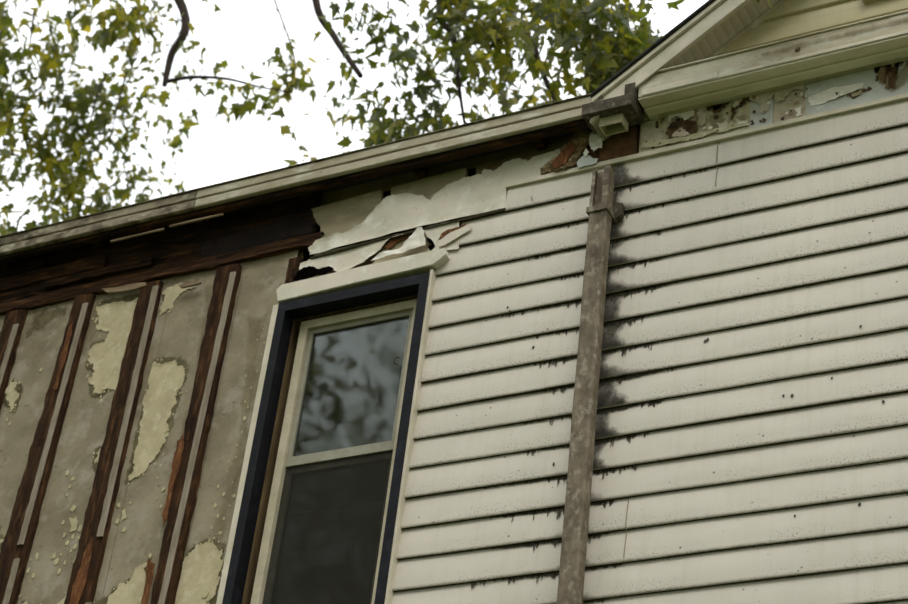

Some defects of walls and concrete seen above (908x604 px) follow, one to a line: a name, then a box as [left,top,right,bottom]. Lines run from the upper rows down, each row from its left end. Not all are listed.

peeling [551,141,598,169]
peeling [640,83,864,150]
peeling [384,235,411,250]
peeling [84,294,139,402]
water stain [592,163,677,479]
peeling [125,356,188,492]
peeling [95,553,152,604]
peeling [175,485,236,604]